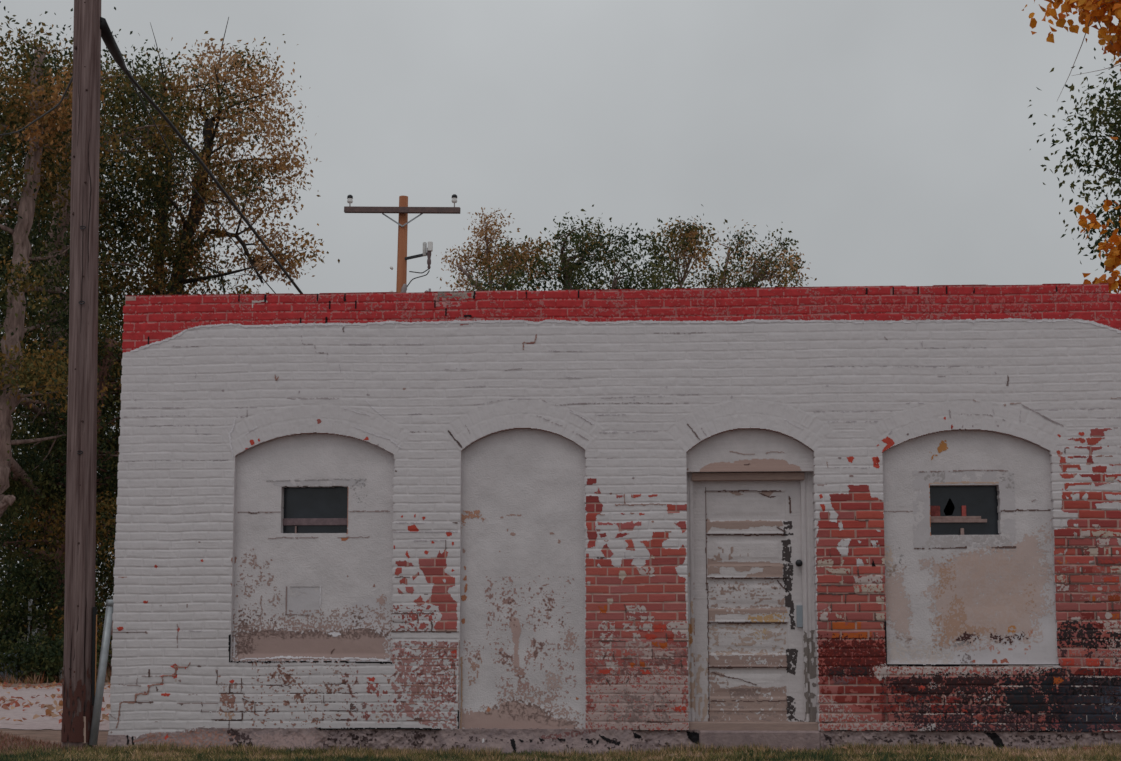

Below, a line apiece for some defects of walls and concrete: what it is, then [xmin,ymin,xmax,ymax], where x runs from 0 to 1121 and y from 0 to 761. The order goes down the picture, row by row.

damp [818,519,1121,732]